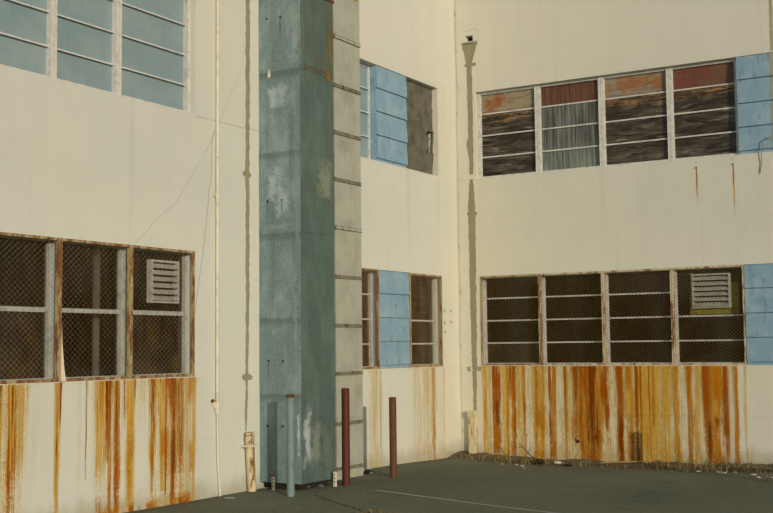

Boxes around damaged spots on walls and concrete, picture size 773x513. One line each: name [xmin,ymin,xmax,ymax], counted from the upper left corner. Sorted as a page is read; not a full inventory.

corrosion [0,384,24,510]
corrosion [54,382,62,513]
corrosion [85,379,136,513]
corrosion [146,377,196,509]
corrosion [482,365,749,464]